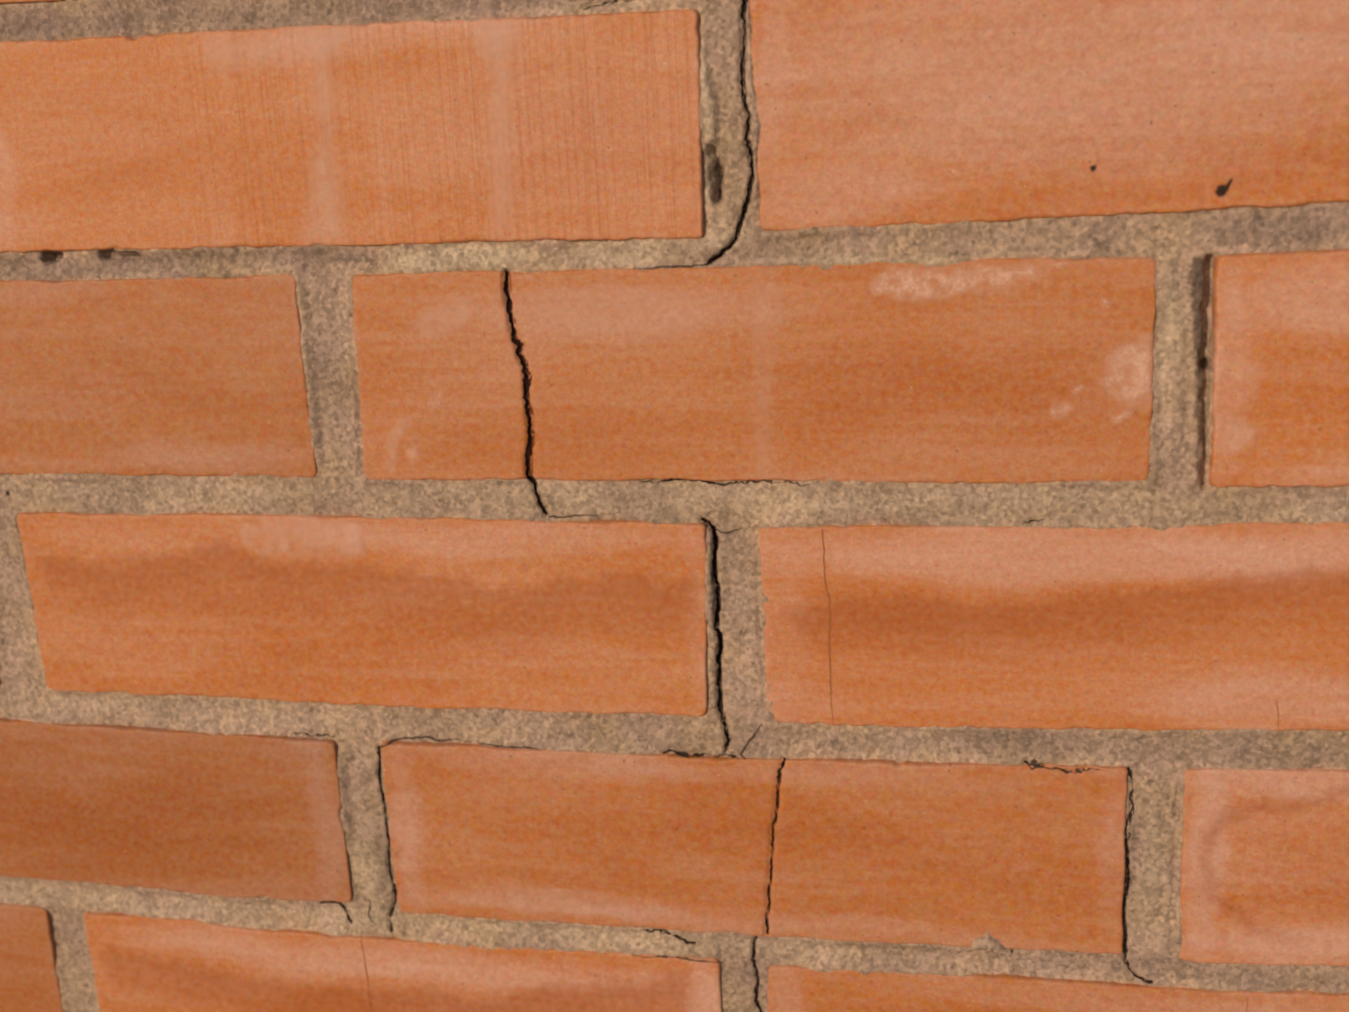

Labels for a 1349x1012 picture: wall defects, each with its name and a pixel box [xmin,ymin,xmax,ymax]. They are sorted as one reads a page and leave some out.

crack [636,0,754,269]
crack [503,271,598,518]
crack [641,478,820,487]
crack [662,518,762,760]
crack [319,736,541,1012]
crack [633,757,786,1012]
crack [1024,759,1153,984]